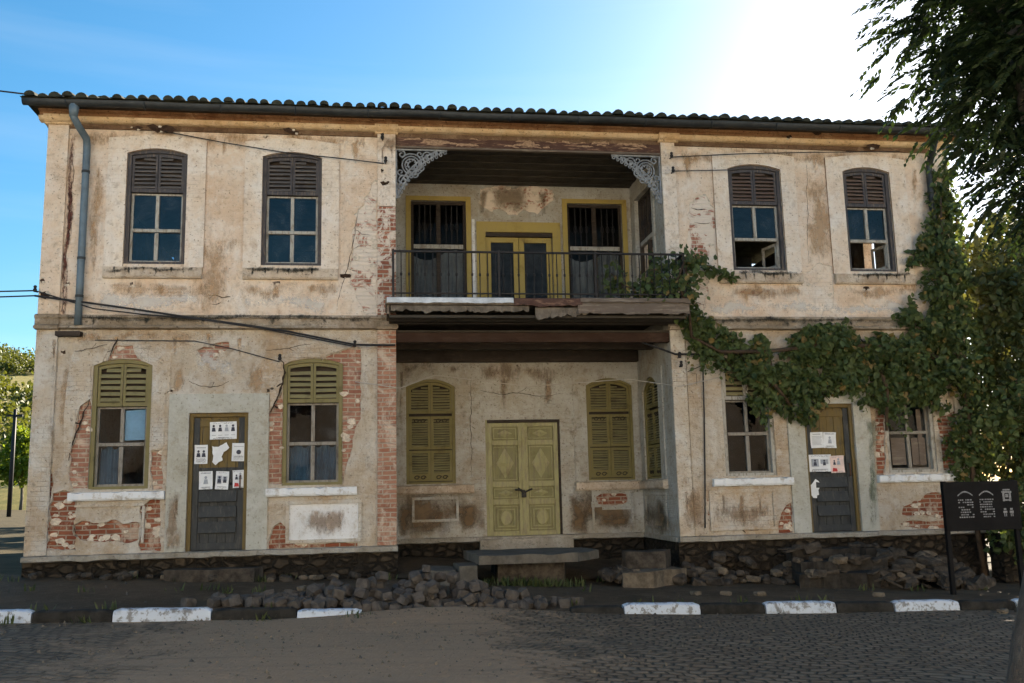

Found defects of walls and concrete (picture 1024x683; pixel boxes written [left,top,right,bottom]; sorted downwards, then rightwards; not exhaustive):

rust [61,136,75,314]
spalling [340,167,391,315]
spalling [479,185,554,215]
spalling [687,194,717,311]
crack [68,399,90,461]
spalling [47,400,163,552]
spalling [267,388,284,485]
spalling [268,522,358,549]
spalling [322,347,362,481]
spalling [778,503,793,534]
spalling [875,409,886,475]
spalling [901,492,944,529]